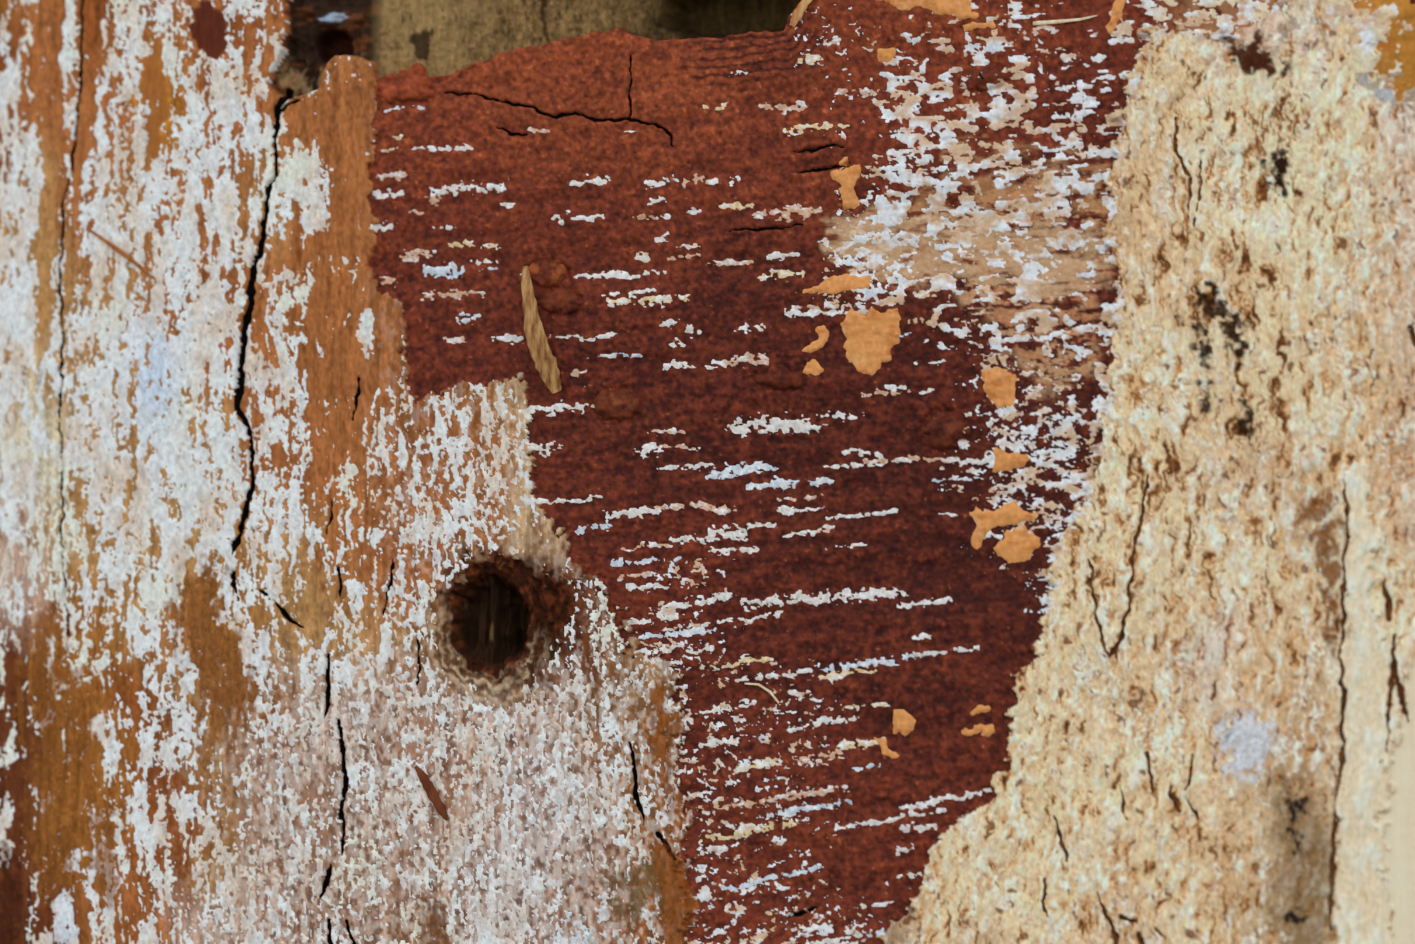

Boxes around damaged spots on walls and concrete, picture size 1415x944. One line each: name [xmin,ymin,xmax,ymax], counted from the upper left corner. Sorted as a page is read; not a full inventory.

crack [444,55,674,147]
peeling [1088,0,1288,60]
peeling [1316,0,1415,119]
crack [231,88,304,628]
peeling [794,0,1142,613]
crack [326,499,343,597]
peeling [0,0,890,944]
crack [319,654,356,944]
peeling [874,709,916,759]
peeling [961,705,995,737]
crack [1327,479,1350,931]
crack [1382,578,1409,753]